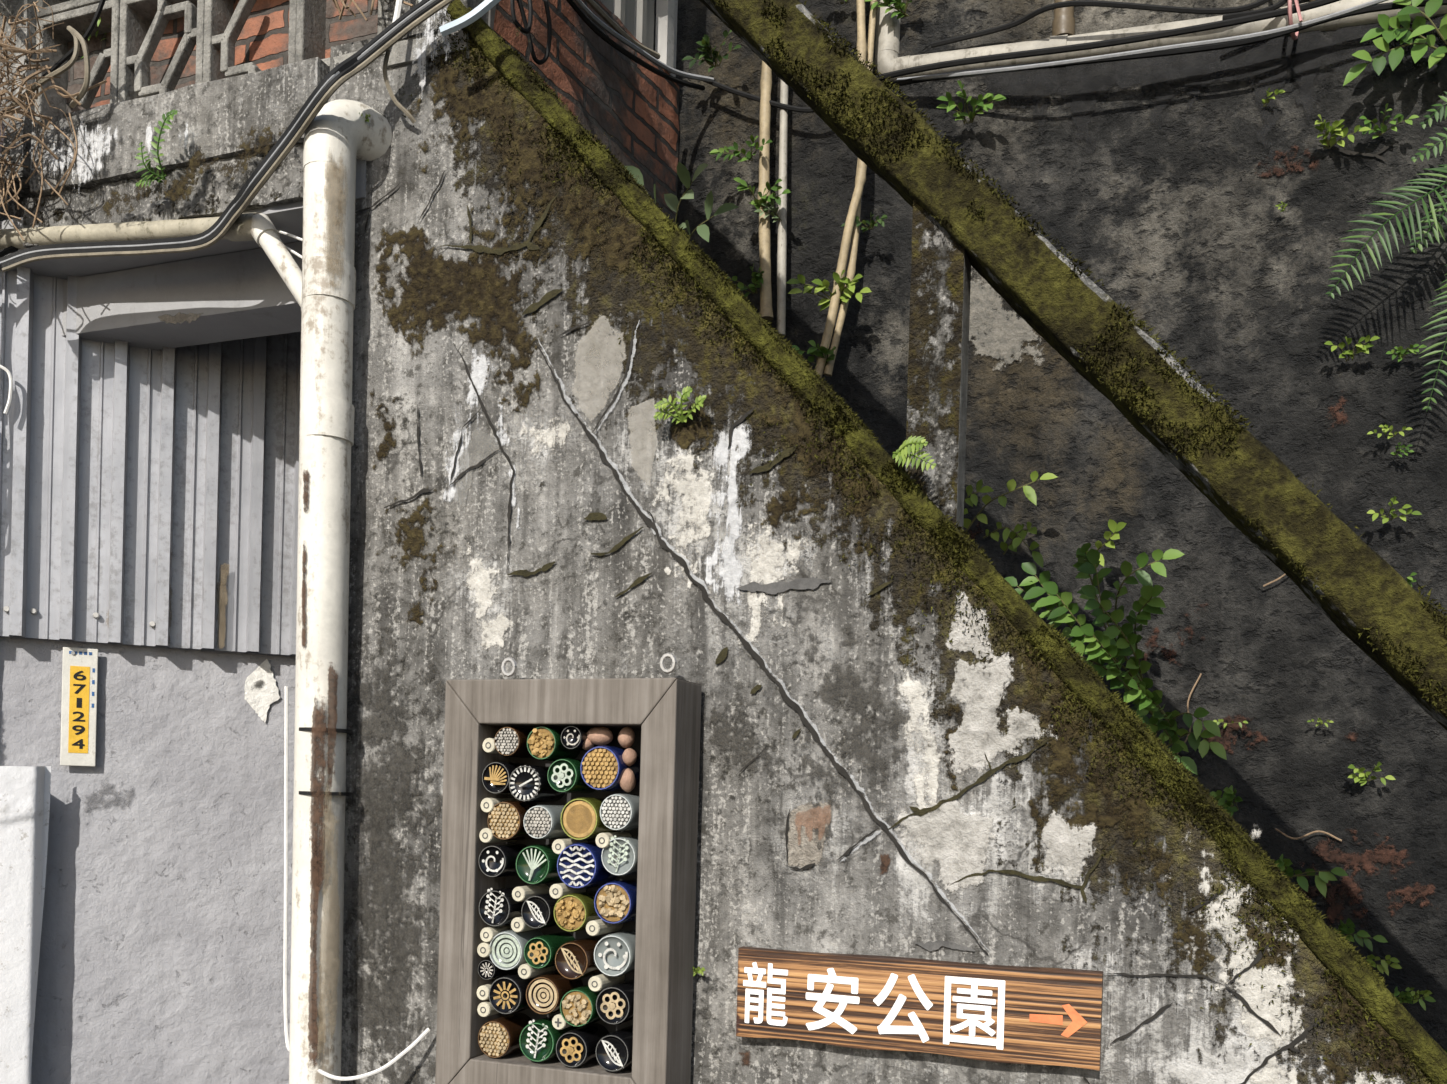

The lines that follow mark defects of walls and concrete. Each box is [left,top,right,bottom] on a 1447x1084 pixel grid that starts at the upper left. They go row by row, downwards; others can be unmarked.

leakage [982,13,1447,163]
crack [355,171,559,255]
crack [384,343,555,577]
crack [522,289,1116,955]
flaking render [946,590,1057,775]
rust [308,662,338,1066]
spalling [787,800,832,868]
spalling [880,854,890,874]
flaking render [898,799,996,894]
flaking render [1040,810,1096,882]
crack [1108,944,1322,1084]